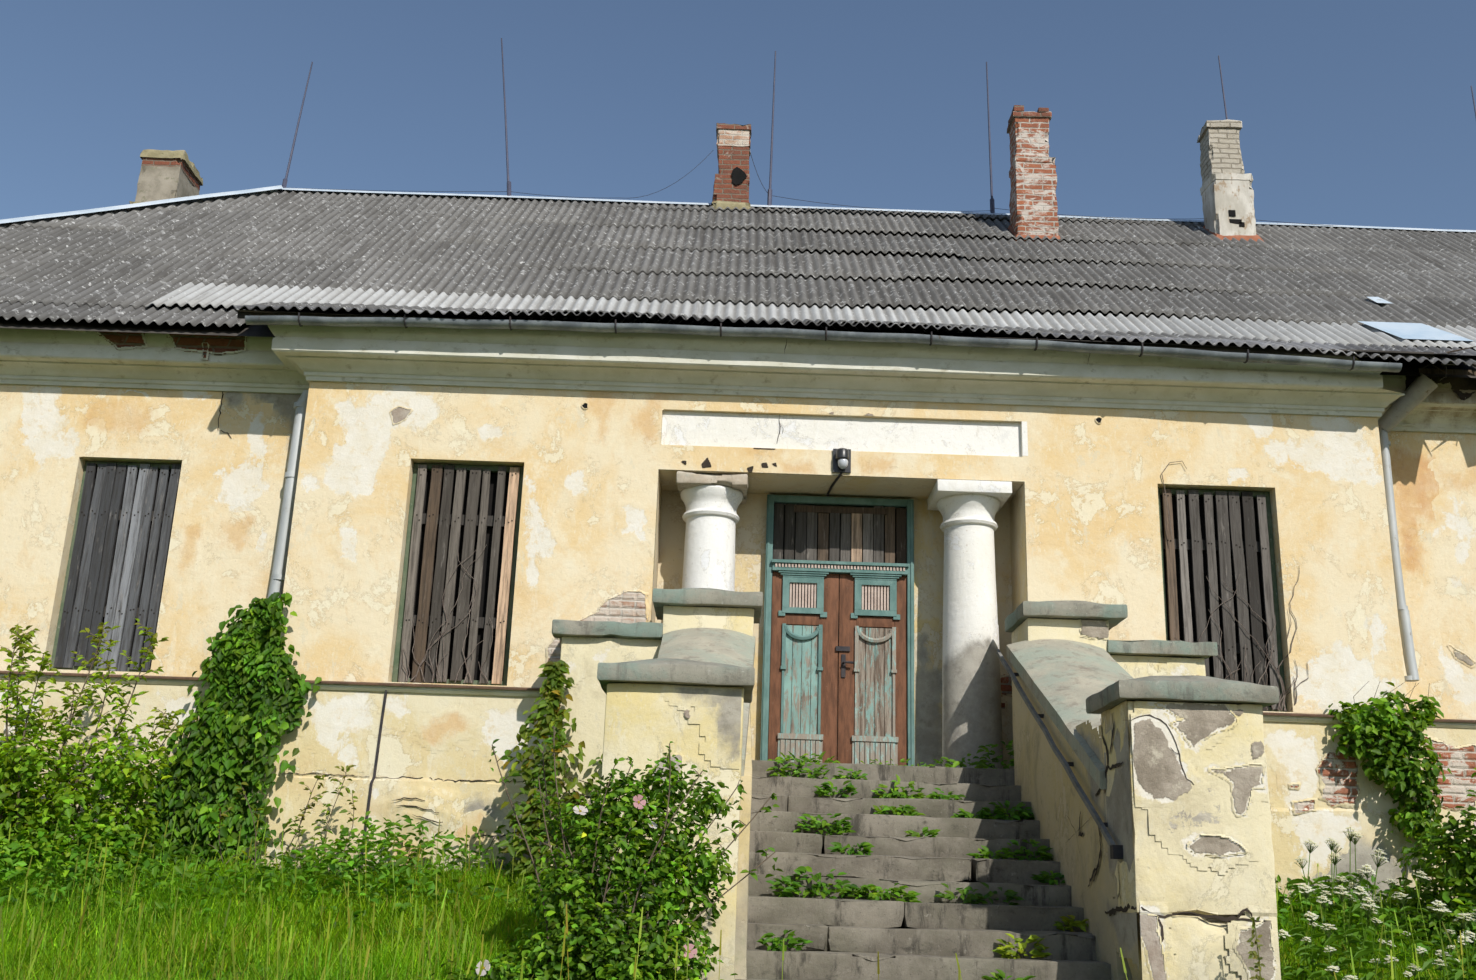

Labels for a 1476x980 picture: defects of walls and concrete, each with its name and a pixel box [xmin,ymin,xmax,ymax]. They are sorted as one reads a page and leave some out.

flaking render [73,330,149,350]
flaking render [167,334,247,361]
crack [217,392,232,439]
flaking render [545,589,651,687]
peeling [1419,631,1476,719]
peeling [1131,603,1408,885]
flaking render [1424,735,1476,812]
crack [1067,714,1268,942]